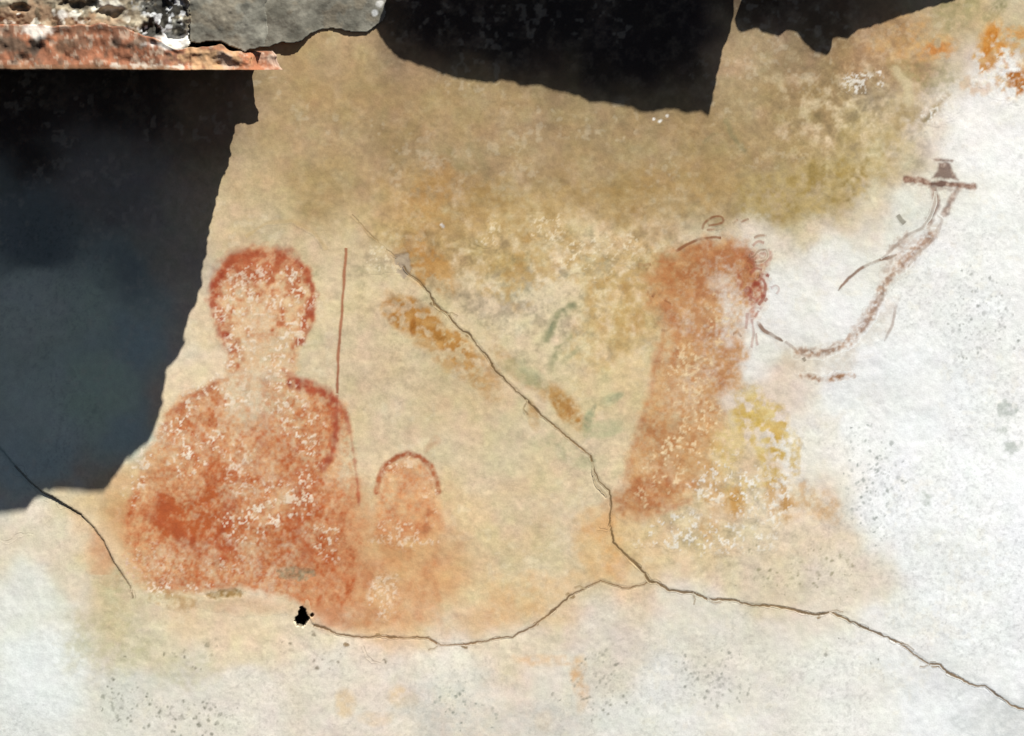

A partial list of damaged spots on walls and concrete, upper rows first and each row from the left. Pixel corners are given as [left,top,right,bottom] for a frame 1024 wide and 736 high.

crack [12,464,136,598]
crack [313,214,1024,711]